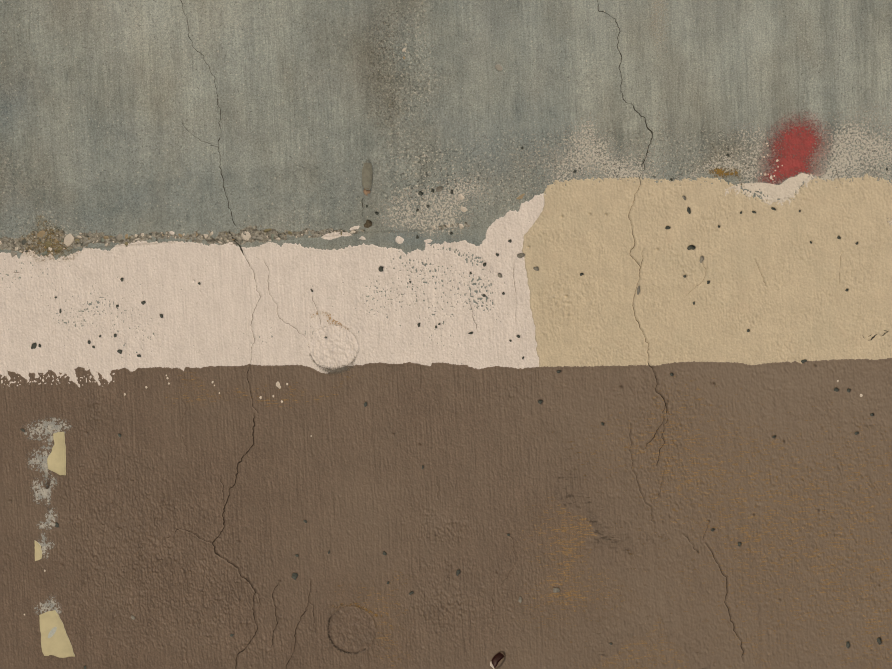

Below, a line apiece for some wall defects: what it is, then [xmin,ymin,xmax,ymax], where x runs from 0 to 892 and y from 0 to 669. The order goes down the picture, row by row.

crack [597,1,668,521]
crack [168,0,321,669]
peeling [24,418,71,486]
peeling [34,533,55,561]
peeling [34,596,75,658]
crack [685,526,744,660]